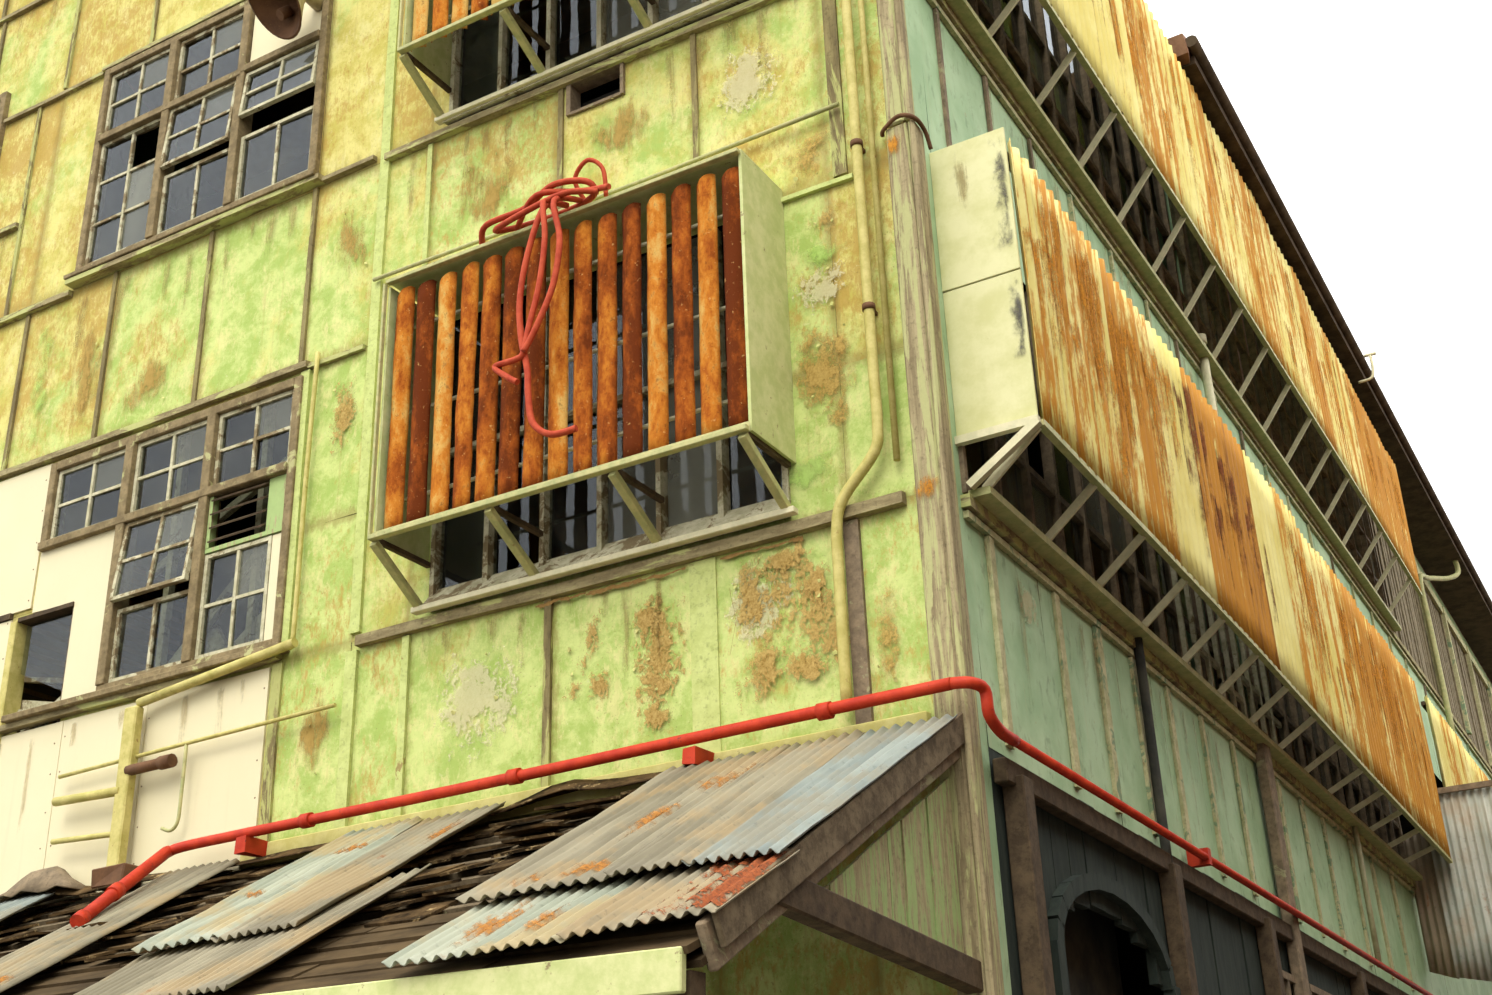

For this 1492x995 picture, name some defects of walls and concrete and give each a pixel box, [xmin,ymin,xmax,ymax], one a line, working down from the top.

peeling [718,48,784,119]
rust [1092,0,1254,240]
peeling [792,261,856,425]
rust [1023,207,1277,611]
rust [1257,271,1404,534]
peeling [438,646,521,762]
peeling [631,590,686,731]
peeling [725,534,850,711]
rust [1288,527,1428,782]
rust [637,851,791,918]